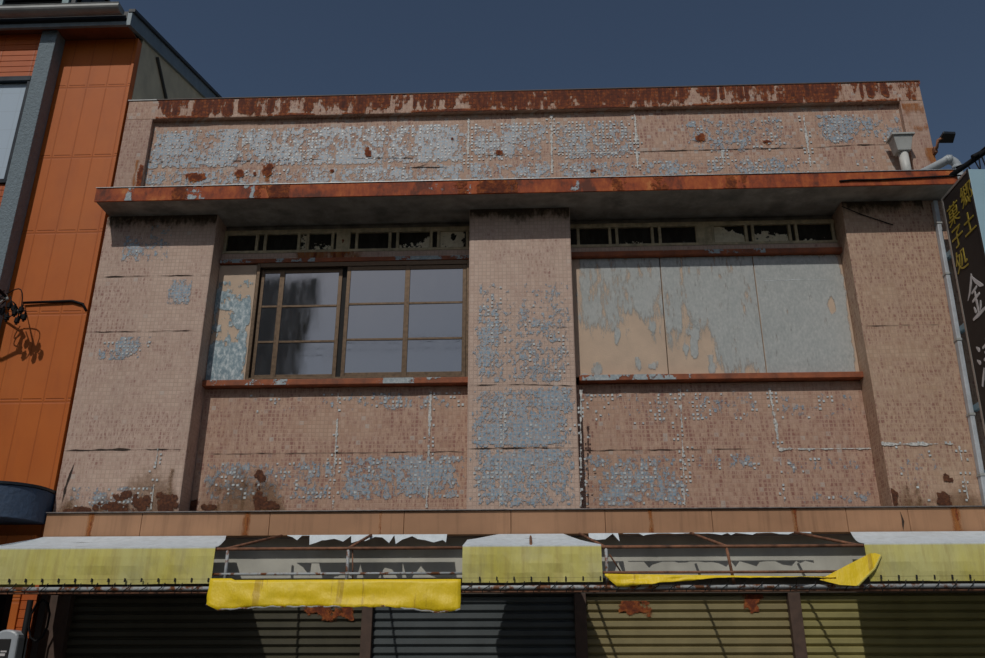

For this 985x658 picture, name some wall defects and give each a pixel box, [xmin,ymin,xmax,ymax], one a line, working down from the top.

rust [155,81,923,119]
rust [454,180,518,194]
peeling [145,114,901,199]
peeling [58,227,871,512]